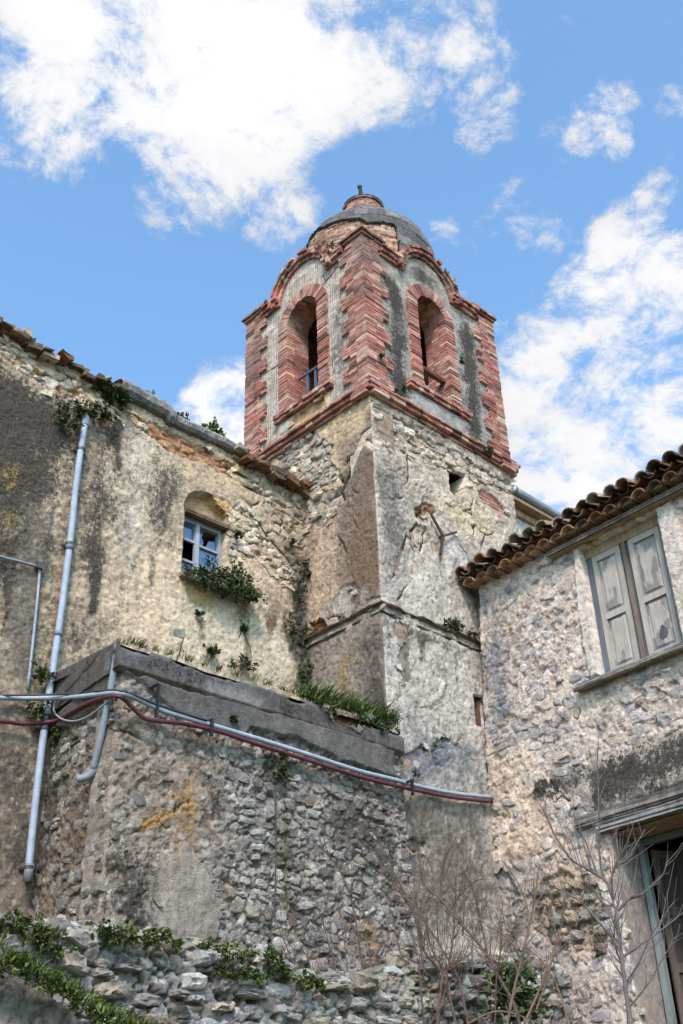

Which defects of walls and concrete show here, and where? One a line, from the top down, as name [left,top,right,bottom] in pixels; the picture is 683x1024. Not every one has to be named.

damp [0,502,65,682]
damp [87,566,102,614]
damp [112,409,146,580]
flaking render [0,317,344,535]
flaking render [205,492,295,592]
crack [391,446,493,601]
damp [532,778,555,799]
damp [592,781,676,812]